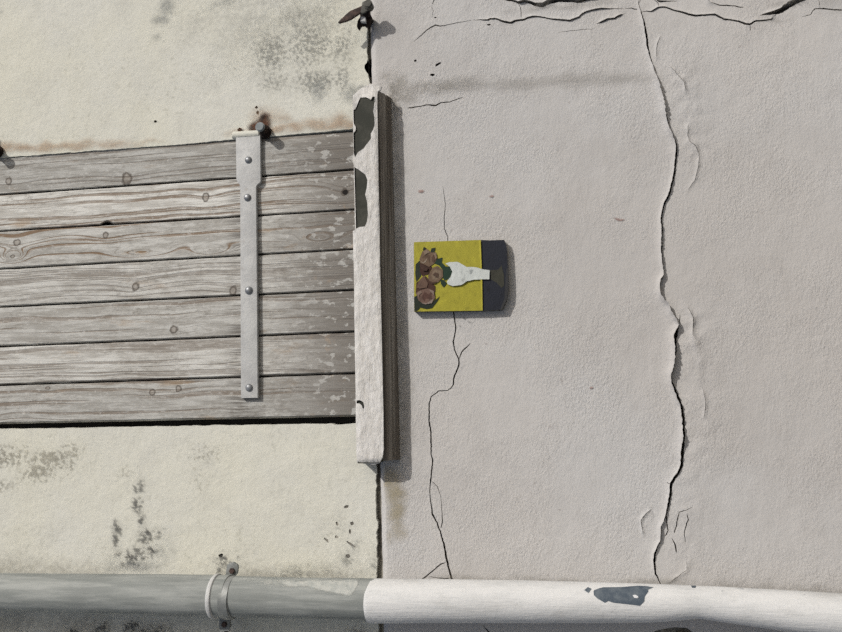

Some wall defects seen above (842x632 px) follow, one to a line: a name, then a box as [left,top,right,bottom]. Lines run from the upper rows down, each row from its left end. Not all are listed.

rust [238,113,270,131]
peeling [353,97,375,156]
peeling [354,167,368,228]
crack [408,0,842,584]
leakage [111,480,159,566]